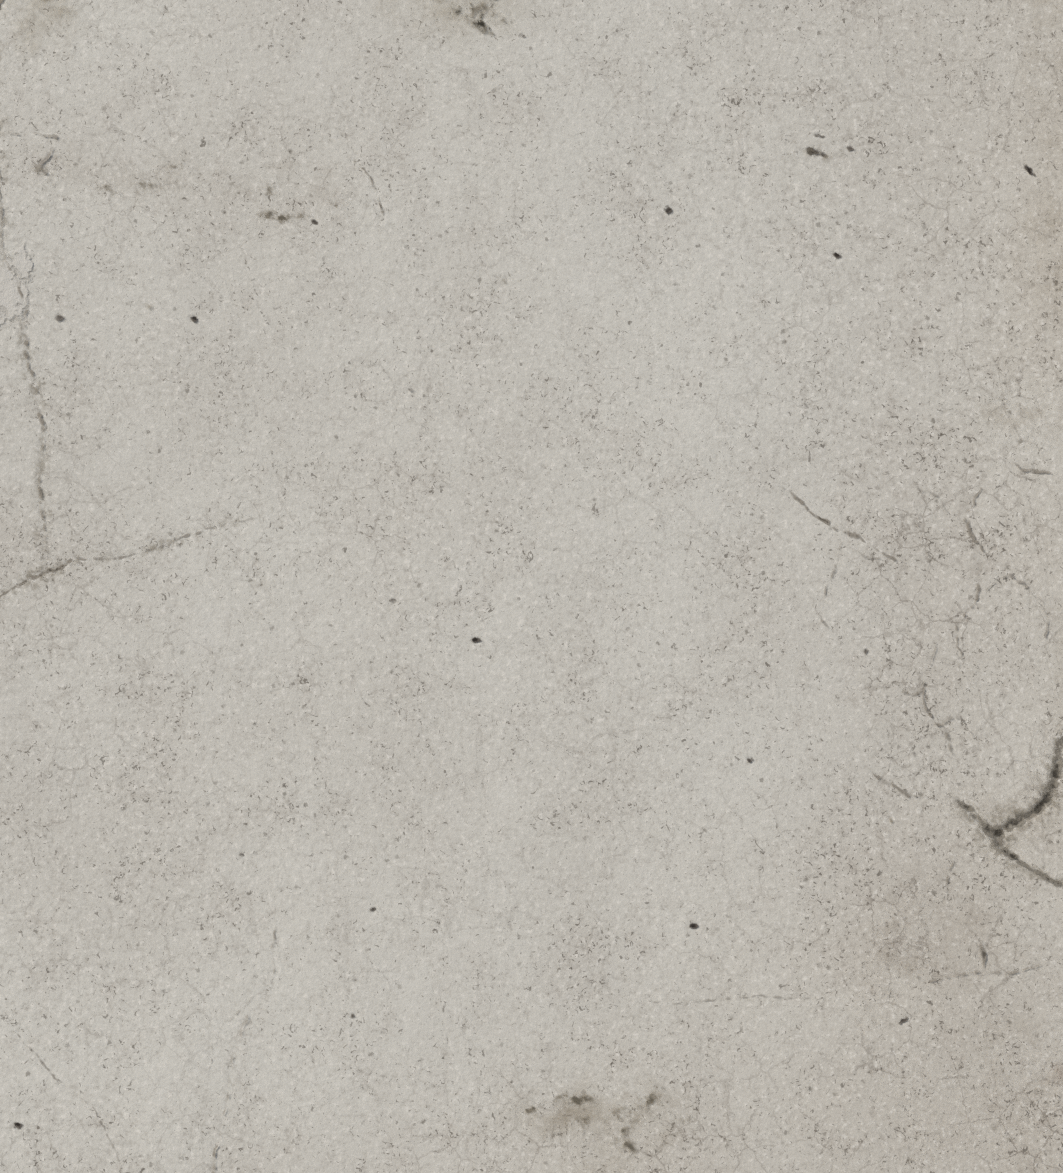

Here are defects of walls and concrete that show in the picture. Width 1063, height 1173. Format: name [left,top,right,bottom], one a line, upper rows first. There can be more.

crack [15,132,57,174]
crack [18,286,44,449]
crack [0,528,207,596]
crack [873,737,1063,886]